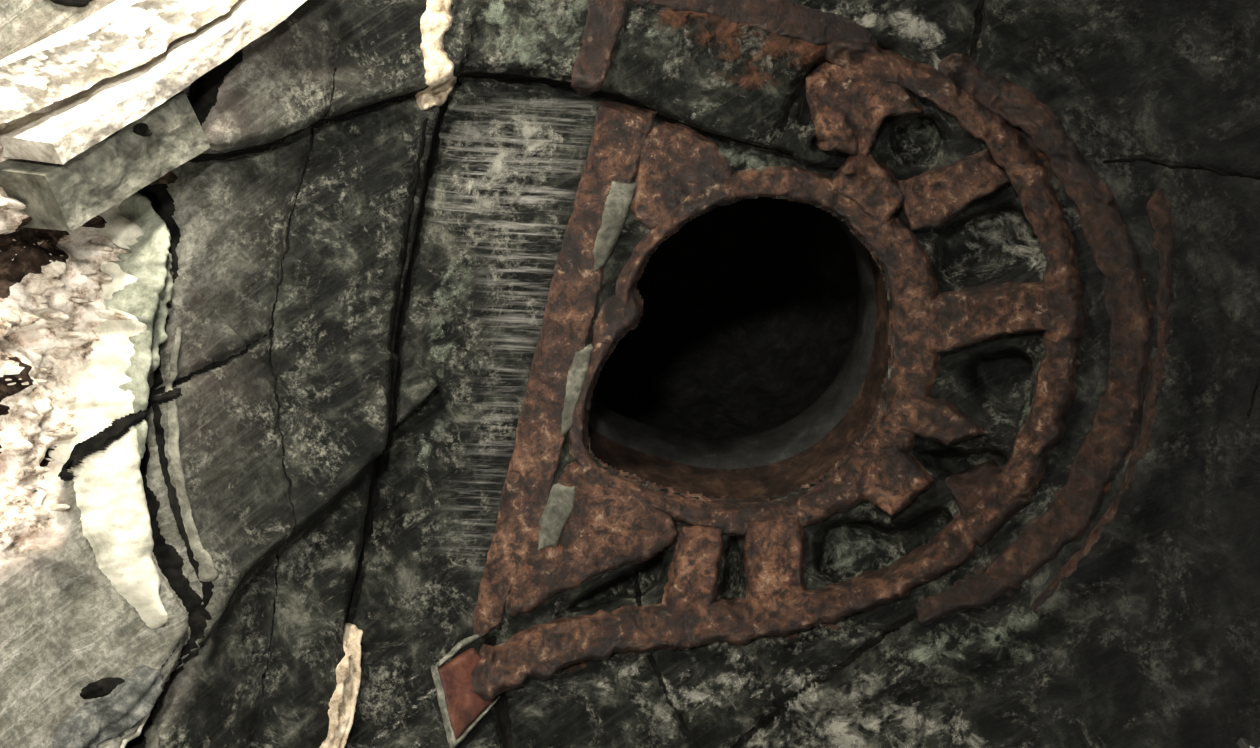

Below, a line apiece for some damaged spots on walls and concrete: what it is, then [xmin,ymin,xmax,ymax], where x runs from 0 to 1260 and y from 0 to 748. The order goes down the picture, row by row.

spalling [133,123,152,137]
crack [1103,157,1260,180]
spalling [137,171,178,193]
spalling [0,195,132,441]
crack [125,42,827,748]
crack [39,446,57,467]
spalling [21,454,70,521]